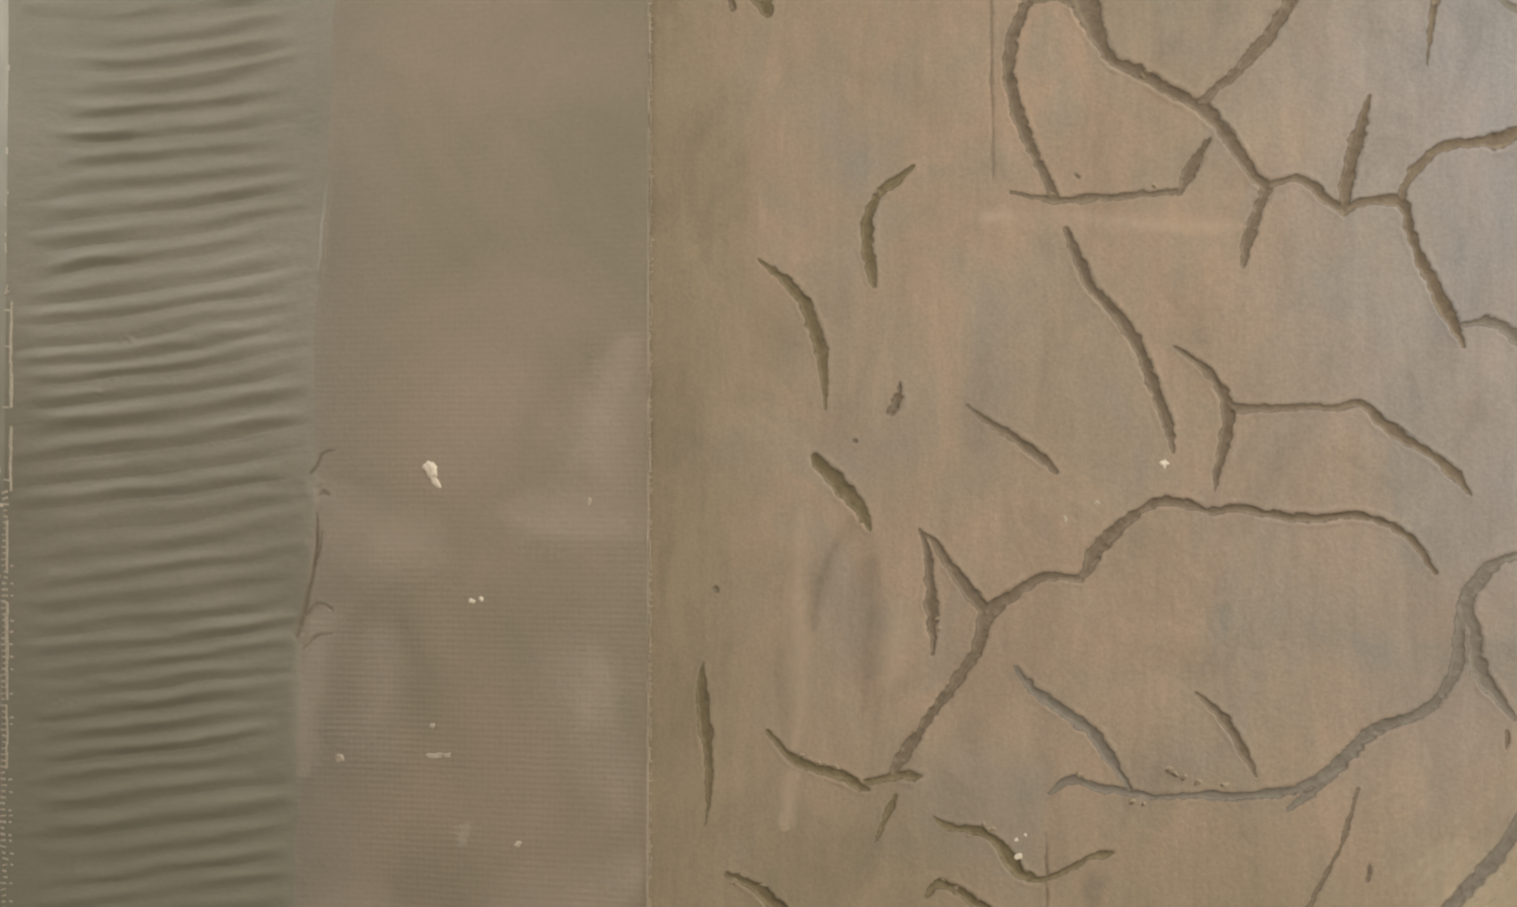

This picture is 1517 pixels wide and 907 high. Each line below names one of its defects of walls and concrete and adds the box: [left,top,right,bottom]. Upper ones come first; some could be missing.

crack [751,0,773,17]
crack [758,0,1517,907]
crack [696,662,714,823]
crack [725,872,787,907]